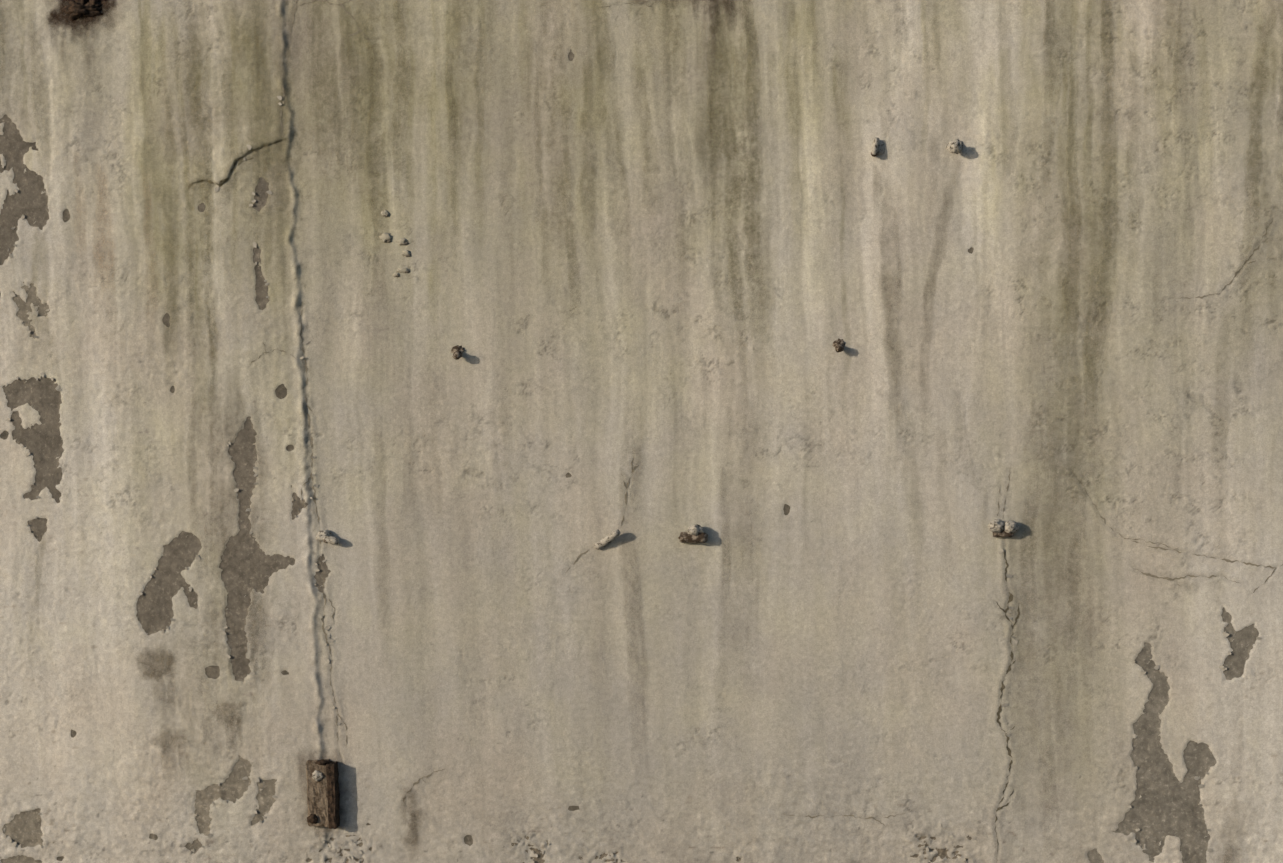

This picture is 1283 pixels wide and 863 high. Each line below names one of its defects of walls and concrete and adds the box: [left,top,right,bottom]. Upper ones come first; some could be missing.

corrosion [48,0,115,29]
crack [188,0,380,192]
peeling [0,114,70,265]
peeling [0,372,64,503]
peeling [0,808,64,863]
peeling [136,531,202,635]
peeling [184,755,277,854]
peeling [205,416,295,682]
crack [995,549,1020,852]
peeling [1113,642,1217,863]
crack [1069,466,1283,594]
peeling [1219,607,1261,680]